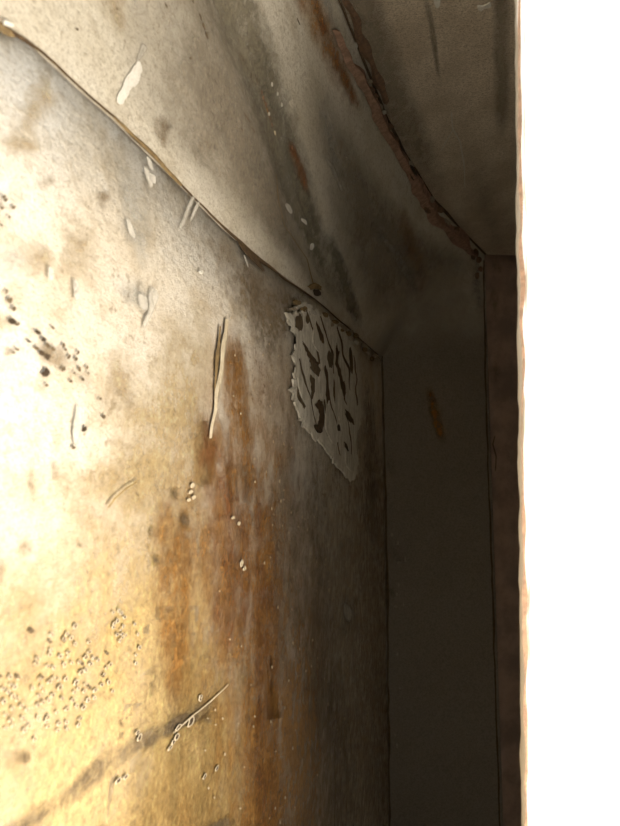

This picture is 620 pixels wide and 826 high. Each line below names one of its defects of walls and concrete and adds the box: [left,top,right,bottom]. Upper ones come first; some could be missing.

rust [300,0,478,257]
crack [0,17,391,826]
water stain [234,265,297,348]
flaking render [284,300,378,482]
crack [338,0,501,826]